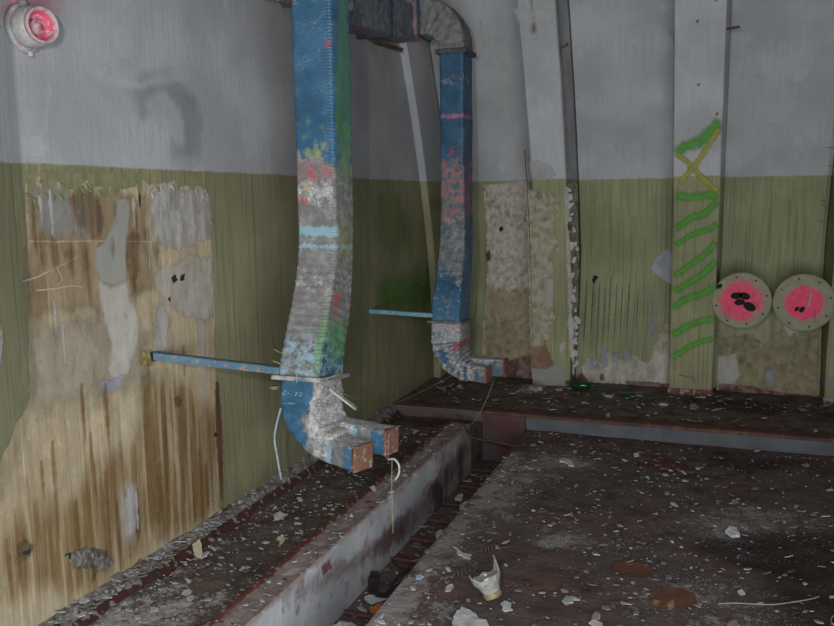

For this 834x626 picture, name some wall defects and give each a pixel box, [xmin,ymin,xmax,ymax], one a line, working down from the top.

peeling [0,171,468,626]
peeling [436,160,834,426]